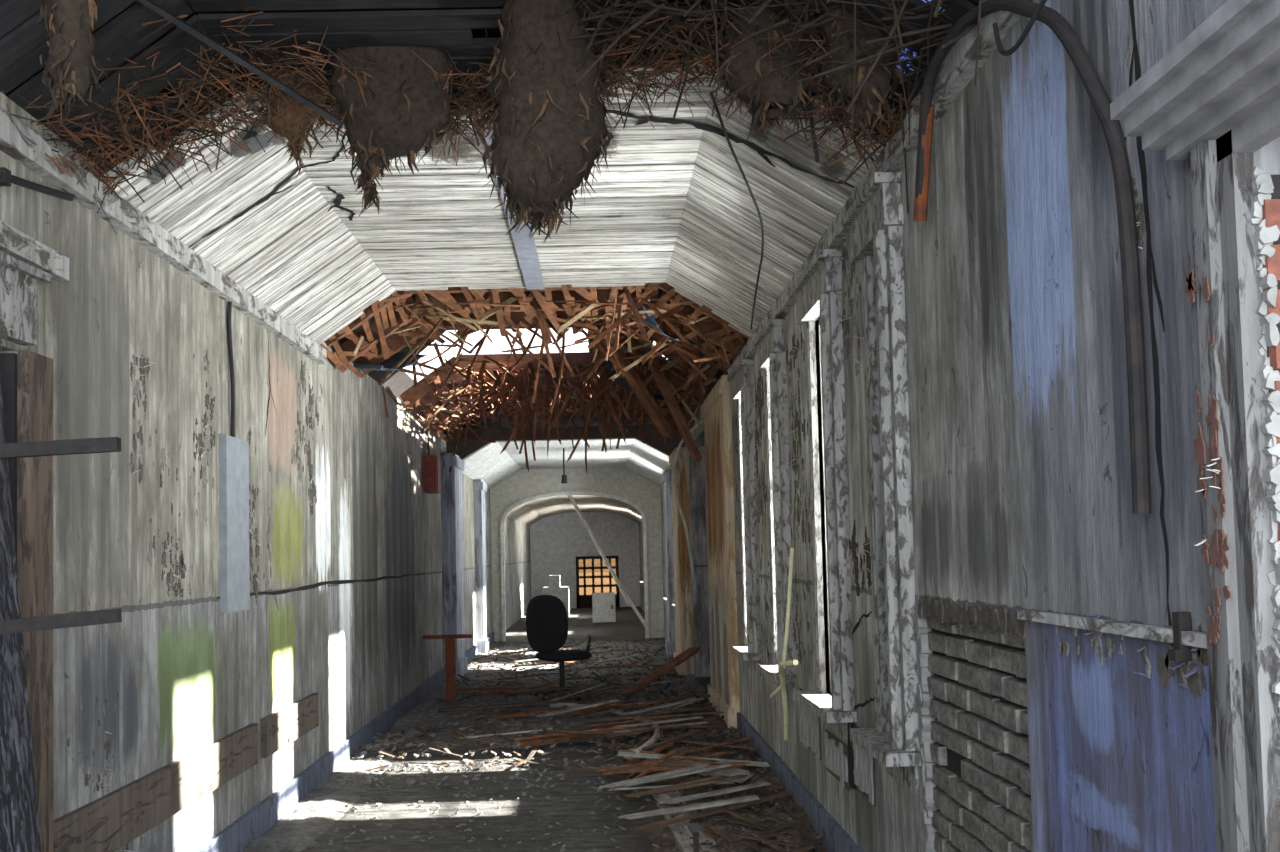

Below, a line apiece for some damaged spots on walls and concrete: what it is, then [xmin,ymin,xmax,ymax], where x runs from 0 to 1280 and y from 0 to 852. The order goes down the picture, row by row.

peeling [5,272,34,295]
peeling [0,319,13,349]